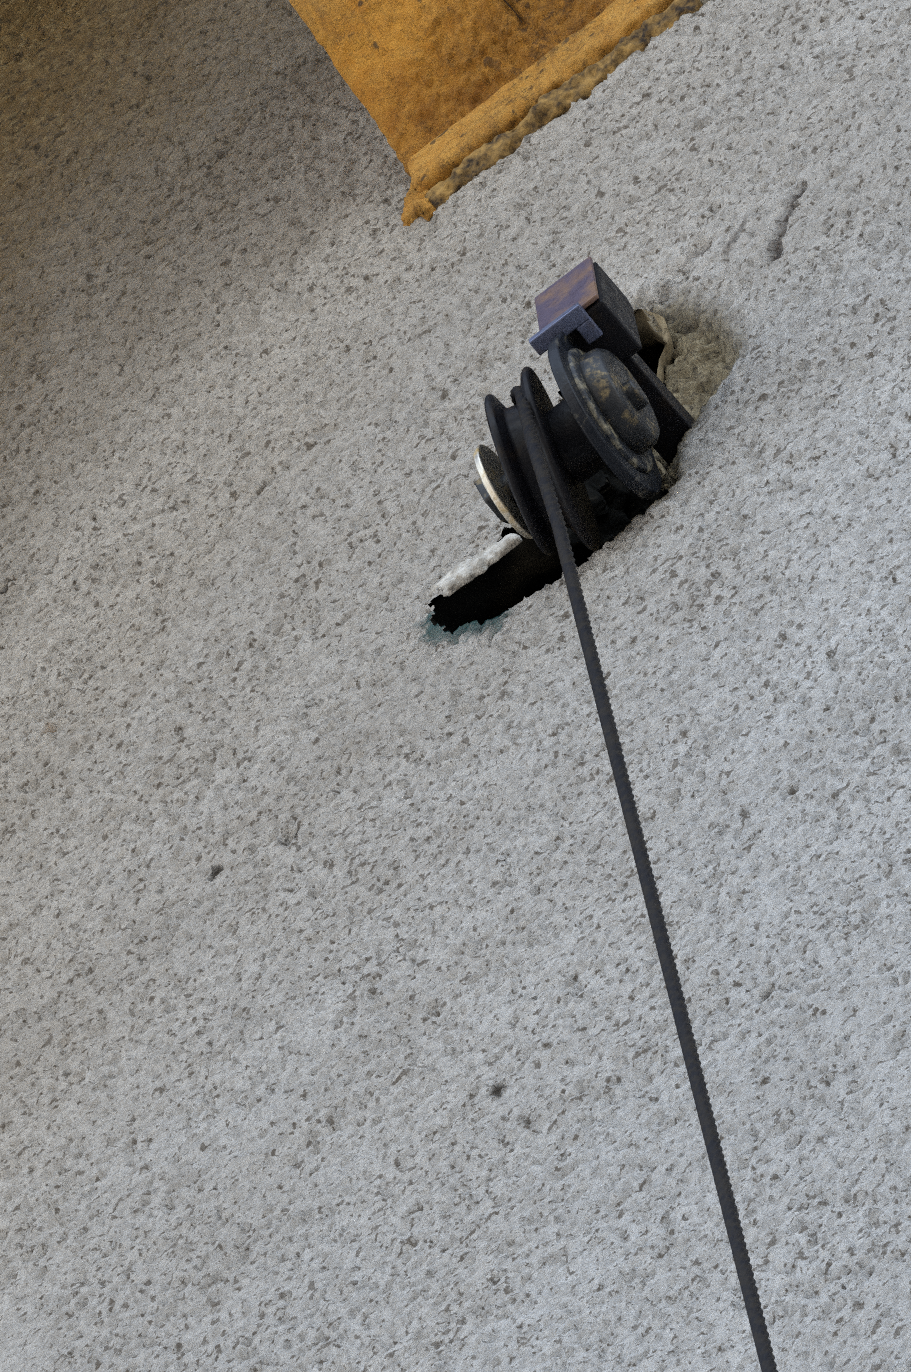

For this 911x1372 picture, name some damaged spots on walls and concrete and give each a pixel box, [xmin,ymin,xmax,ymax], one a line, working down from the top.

spalling [428,302,739,635]